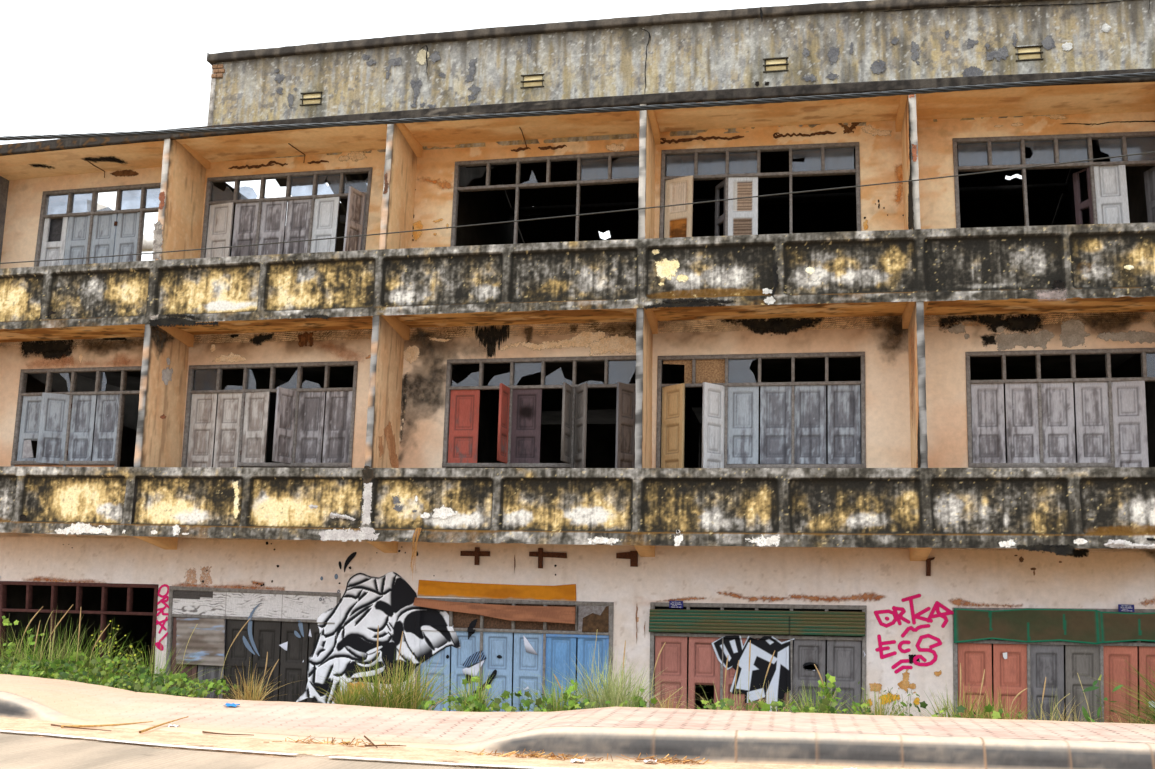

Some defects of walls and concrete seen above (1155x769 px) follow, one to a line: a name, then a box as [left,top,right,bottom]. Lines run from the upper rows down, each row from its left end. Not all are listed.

peeling [803,42,854,82]
peeling [870,60,887,74]
peeling [891,37,921,66]
peeling [962,33,1018,77]
peeling [54,522,126,548]